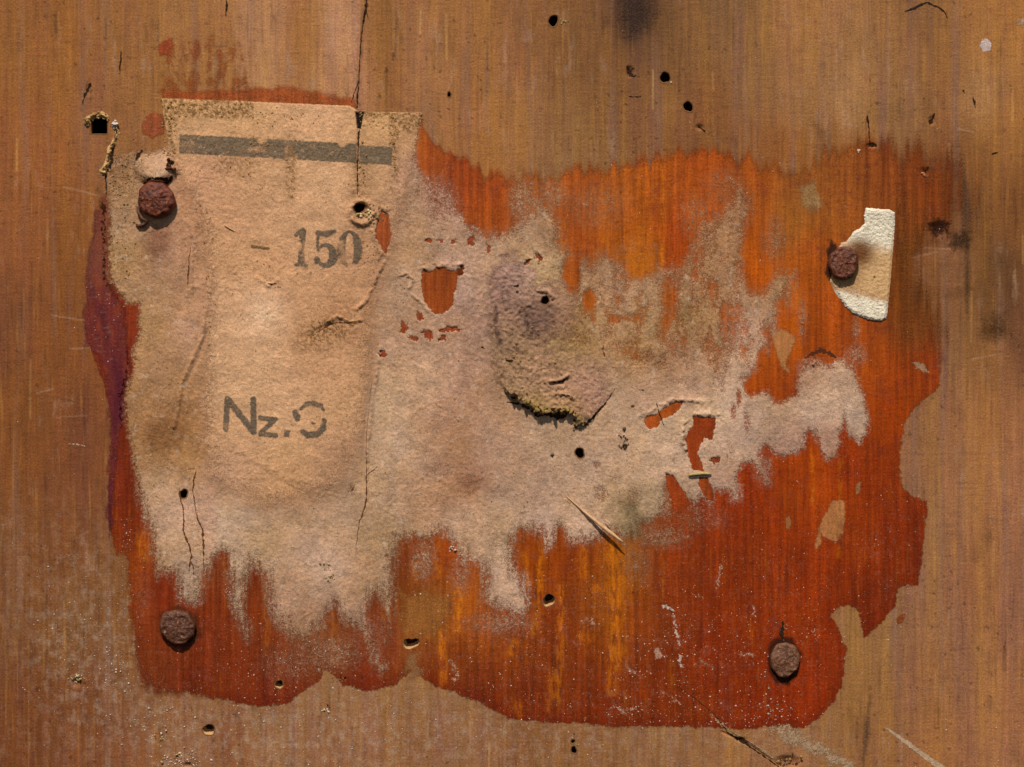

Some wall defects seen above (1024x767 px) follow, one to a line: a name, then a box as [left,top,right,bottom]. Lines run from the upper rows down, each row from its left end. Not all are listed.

peeling [84,111,118,129]
crack [351,0,369,196]
peeling [356,209,391,254]
rust [825,240,837,282]
peeling [401,265,464,341]
spalling [771,329,795,372]
peeling [644,401,683,429]
peeling [685,416,720,501]
peeling [666,474,690,514]
crack [179,469,205,575]
spalling [815,500,845,549]
rust [768,637,801,685]